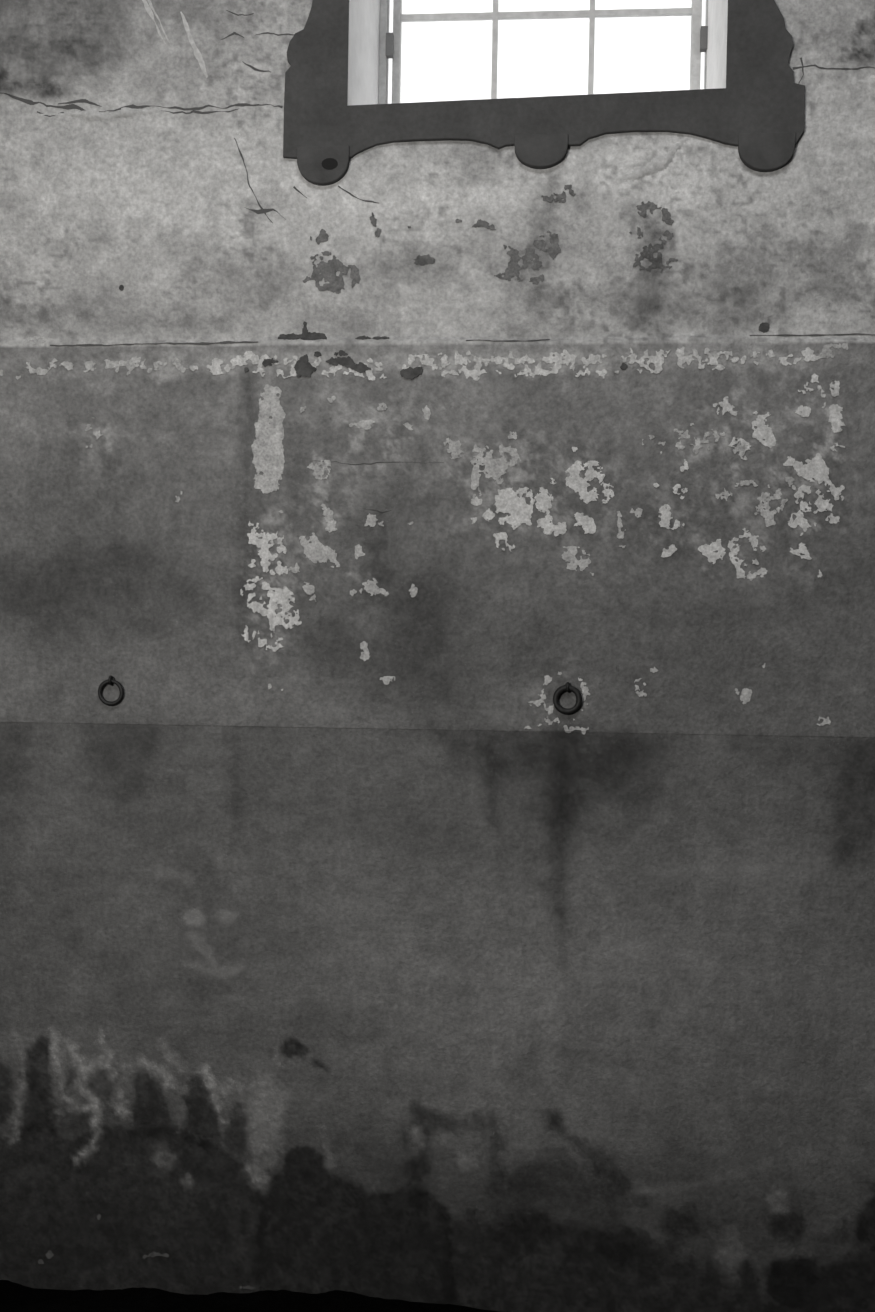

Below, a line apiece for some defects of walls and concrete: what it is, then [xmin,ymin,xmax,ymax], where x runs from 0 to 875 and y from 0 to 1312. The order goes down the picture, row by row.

crack [221,10,294,72]
crack [792,58,874,84]
crack [2,93,307,223]
crack [338,185,378,203]
spalling [303,229,361,294]
peeling [0,321,848,581]
peeling [240,504,340,652]
peeling [350,578,389,596]
peeling [360,641,370,661]
water stain [0,1039,875,1312]